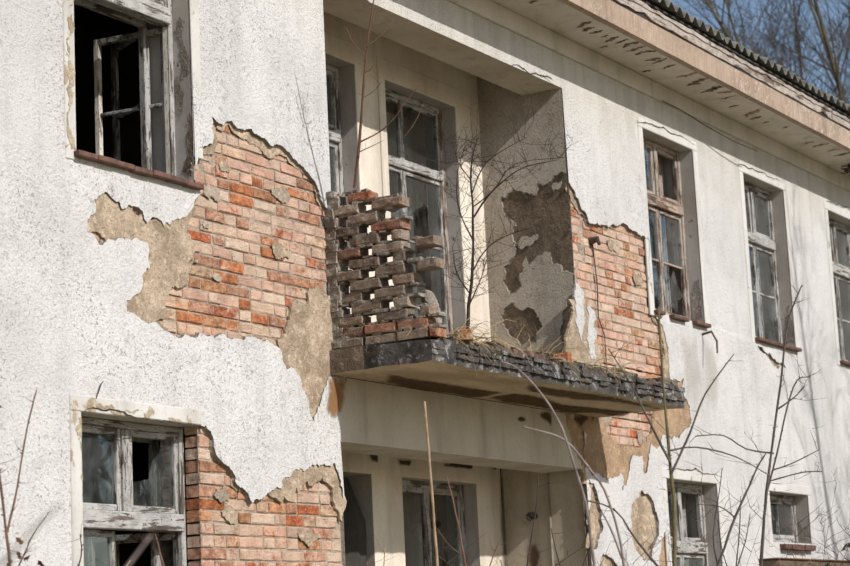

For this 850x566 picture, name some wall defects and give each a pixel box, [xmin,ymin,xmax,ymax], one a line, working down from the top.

flaking render [87,17,347,422]
flaking render [500,171,684,387]
flaking render [169,417,347,566]
flaking render [563,397,691,566]